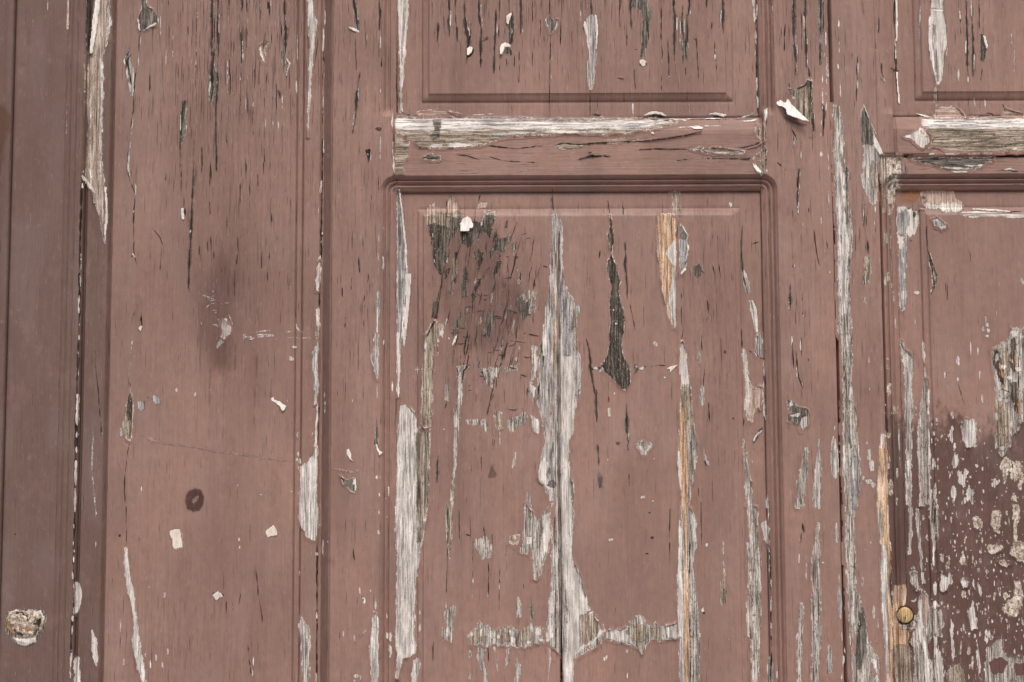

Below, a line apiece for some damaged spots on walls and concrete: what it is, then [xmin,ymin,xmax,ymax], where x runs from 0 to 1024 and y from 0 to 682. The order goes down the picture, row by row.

peeling [81,0,115,246]
peeling [291,0,361,682]
peeling [343,0,1024,682]